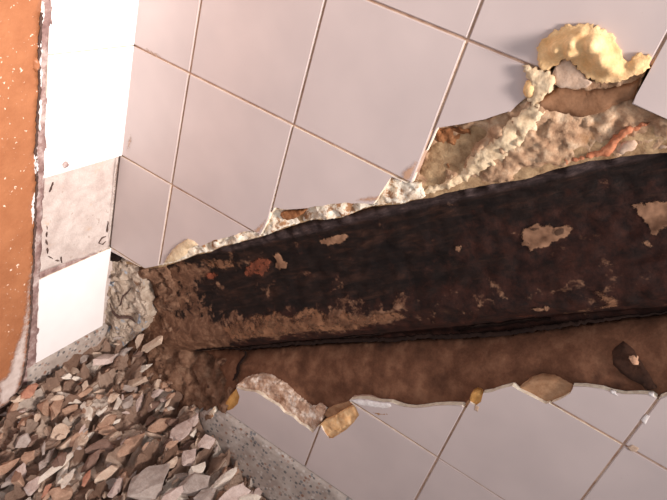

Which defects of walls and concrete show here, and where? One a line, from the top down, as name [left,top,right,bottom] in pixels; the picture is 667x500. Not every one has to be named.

corrosion [202,259,235,279]
corrosion [245,253,288,276]
spalling [31,65,667,438]
crack [109,288,136,323]